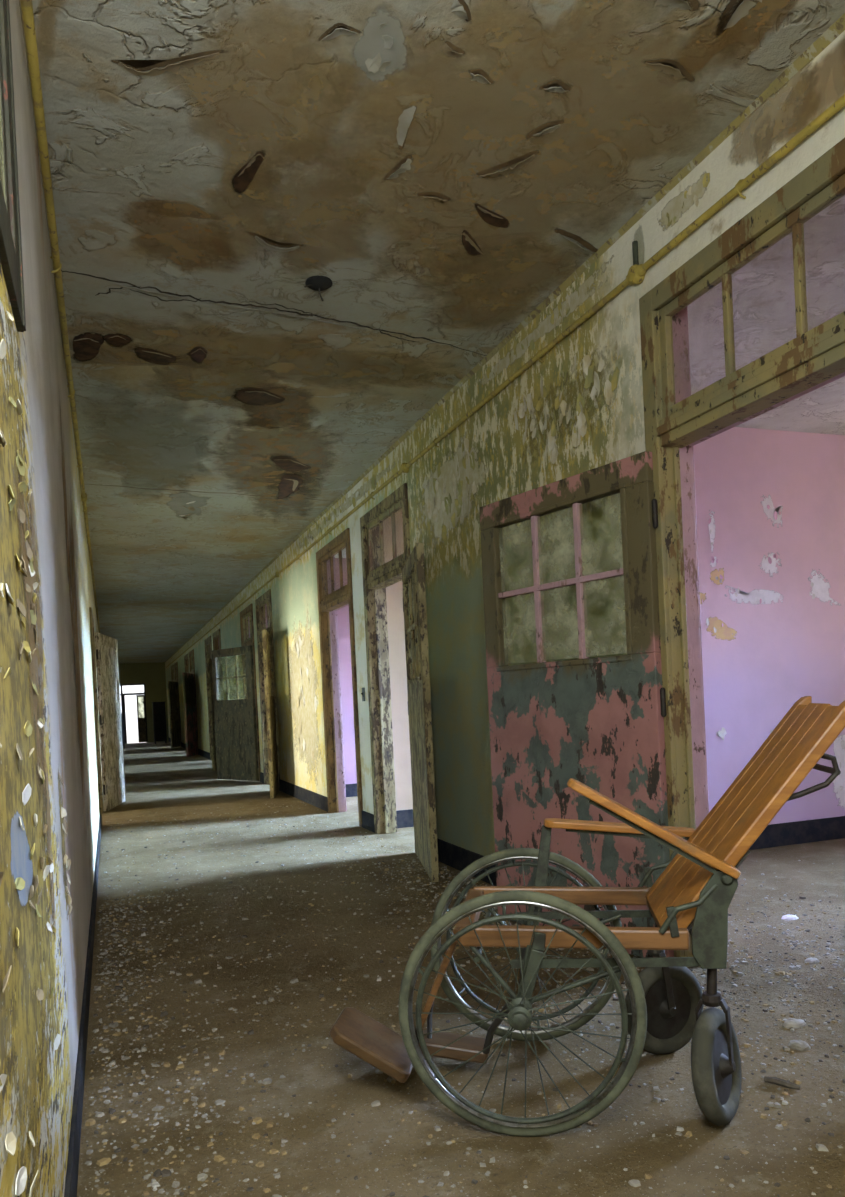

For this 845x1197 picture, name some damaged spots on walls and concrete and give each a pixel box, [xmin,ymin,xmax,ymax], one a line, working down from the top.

peeling [715,0,762,36]
peeling [645,59,695,82]
spalling [232,151,265,194]
peeling [384,106,417,180]
leakage [128,0,795,326]
spalling [475,203,509,228]
peeling [658,172,710,231]
leakage [733,65,815,165]
leakage [93,323,427,515]
peeling [700,511,784,605]
peeling [706,617,737,641]
peeling [0,285,72,1197]